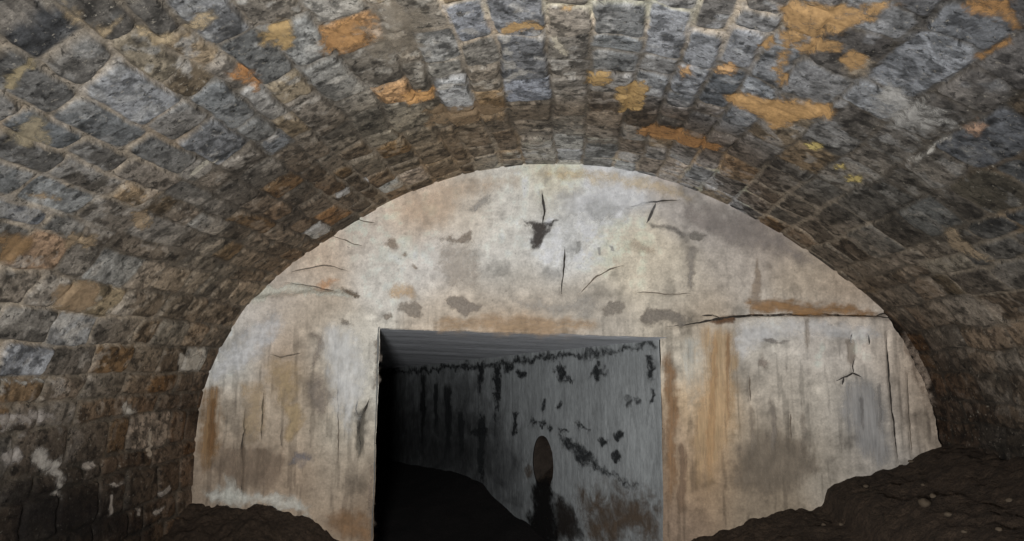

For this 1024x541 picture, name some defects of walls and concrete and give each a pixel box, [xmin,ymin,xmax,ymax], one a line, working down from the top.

crack [540,194,548,223]
crack [631,200,677,222]
crack [561,249,623,294]
leakage [381,341,655,495]
crack [668,313,912,458]
leakage [513,457,658,541]